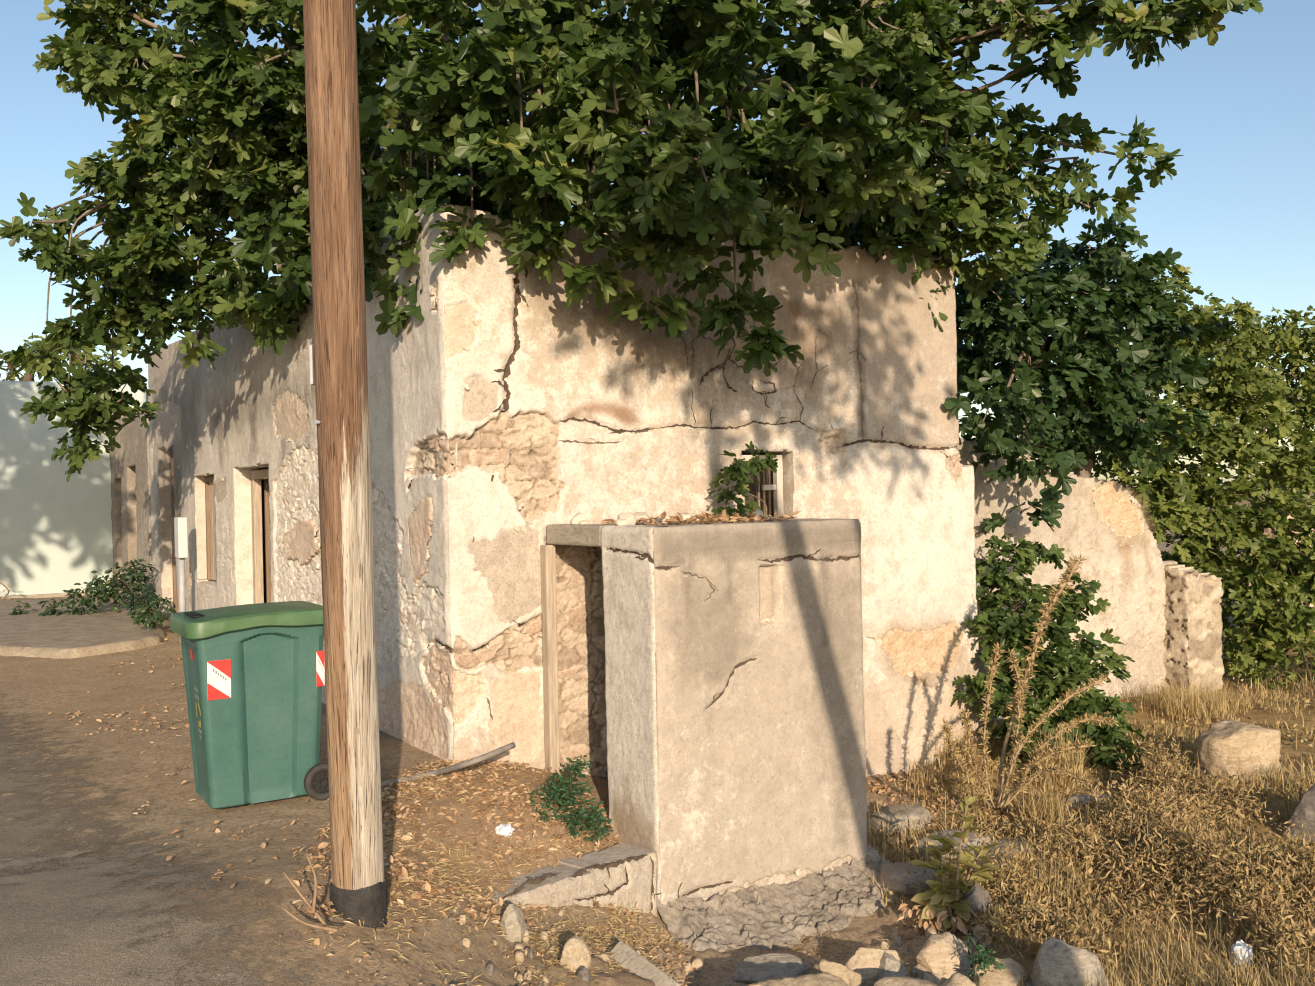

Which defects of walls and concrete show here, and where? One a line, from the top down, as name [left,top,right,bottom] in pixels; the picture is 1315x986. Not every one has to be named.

crack [558,285,957,458]
flaking render [273,390,323,606]
flaking render [372,377,607,777]
crack [706,658,757,709]